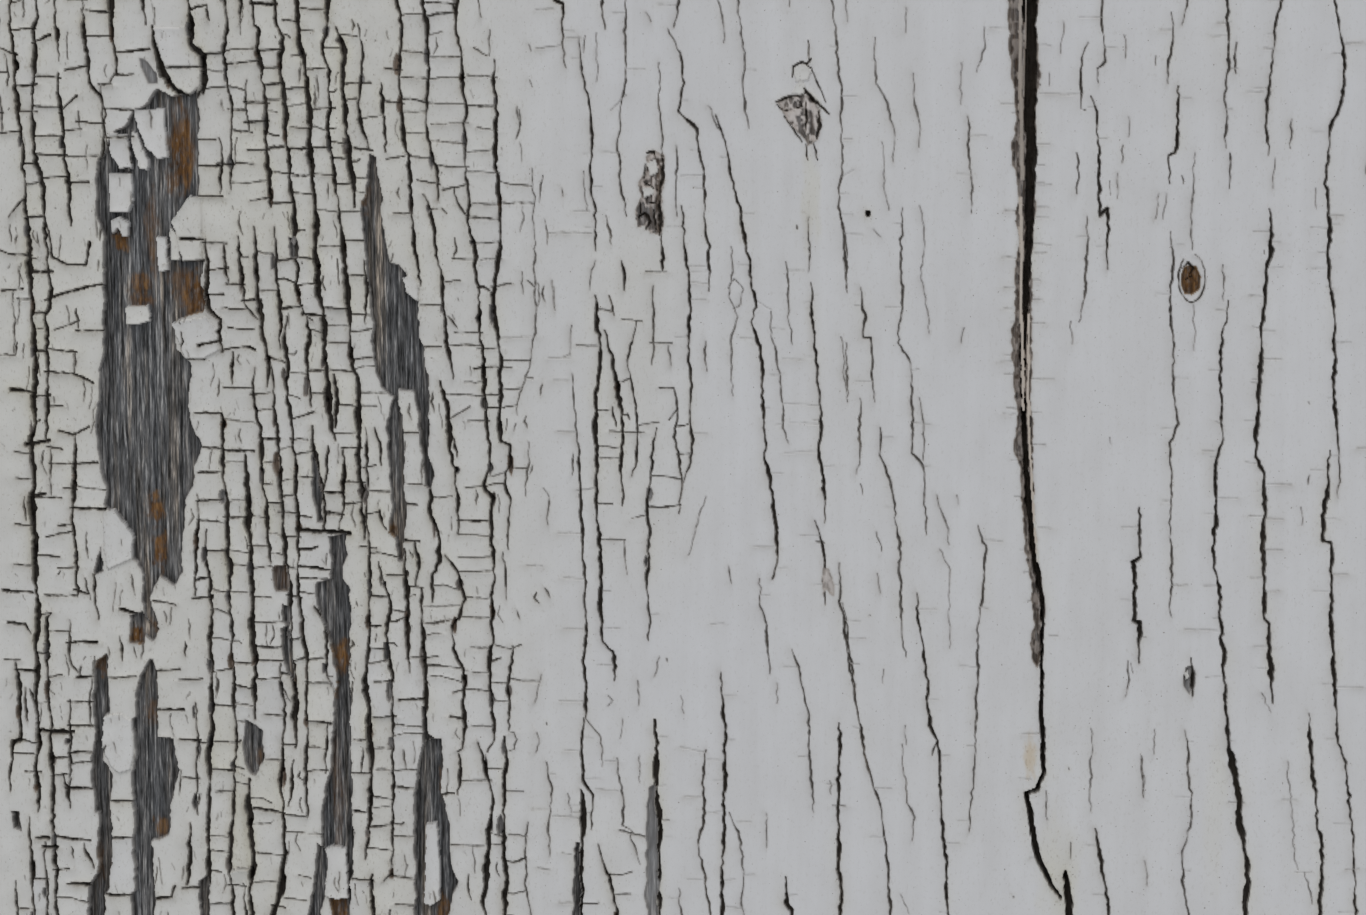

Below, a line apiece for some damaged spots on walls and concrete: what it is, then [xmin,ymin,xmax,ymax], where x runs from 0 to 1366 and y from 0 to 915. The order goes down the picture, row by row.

peeling [86,26,221,915]
peeling [360,153,435,563]
crack [0,0,1005,915]
crack [1038,0,1366,915]